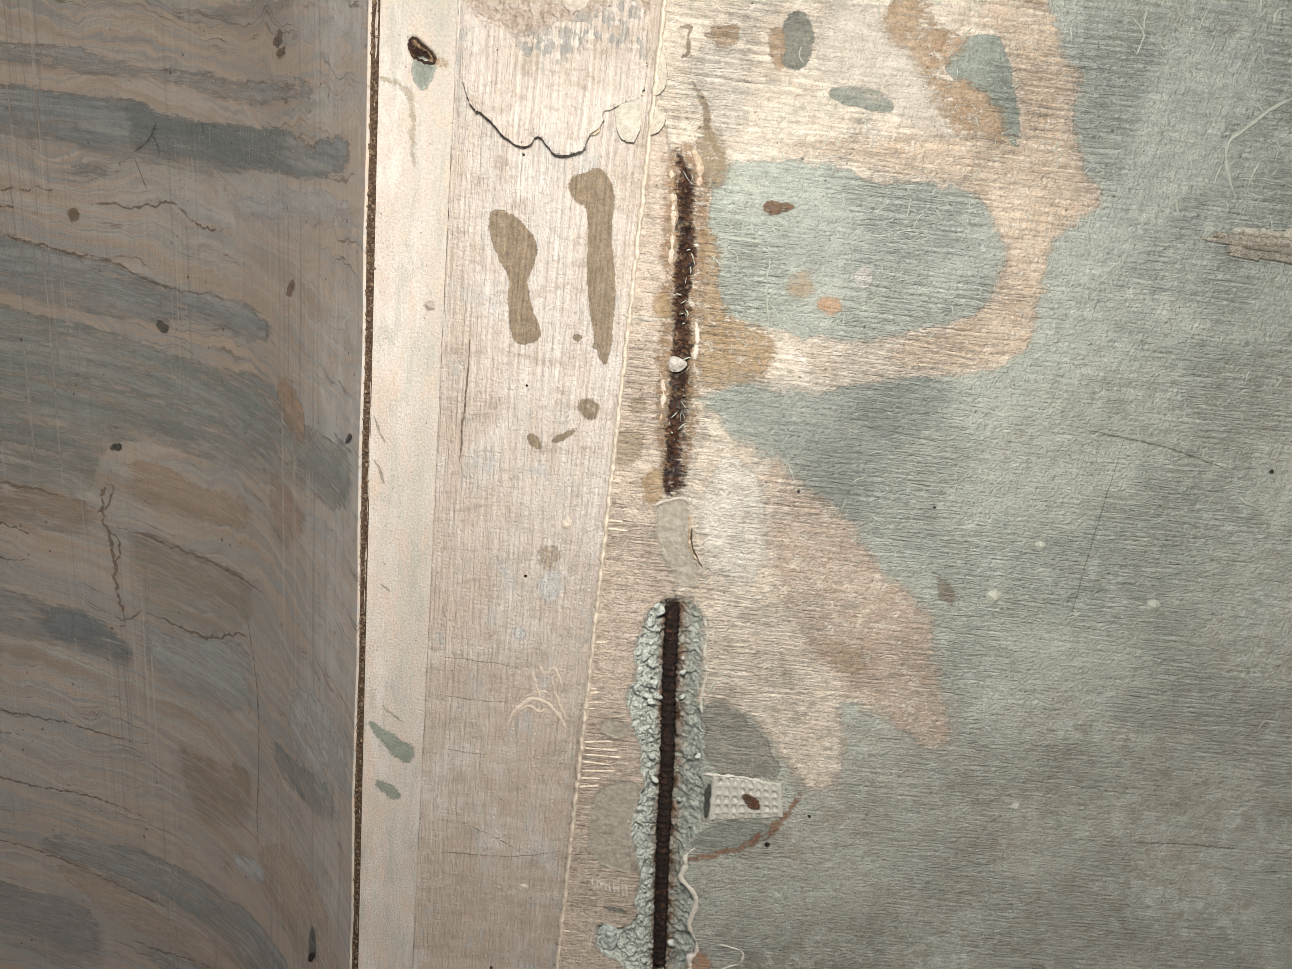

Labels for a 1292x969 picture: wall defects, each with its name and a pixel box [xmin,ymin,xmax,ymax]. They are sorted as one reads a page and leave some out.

spalling [407,36,446,67]
peeling [462,0,667,155]
corrosion [641,144,709,504]
spalling [594,595,730,969]